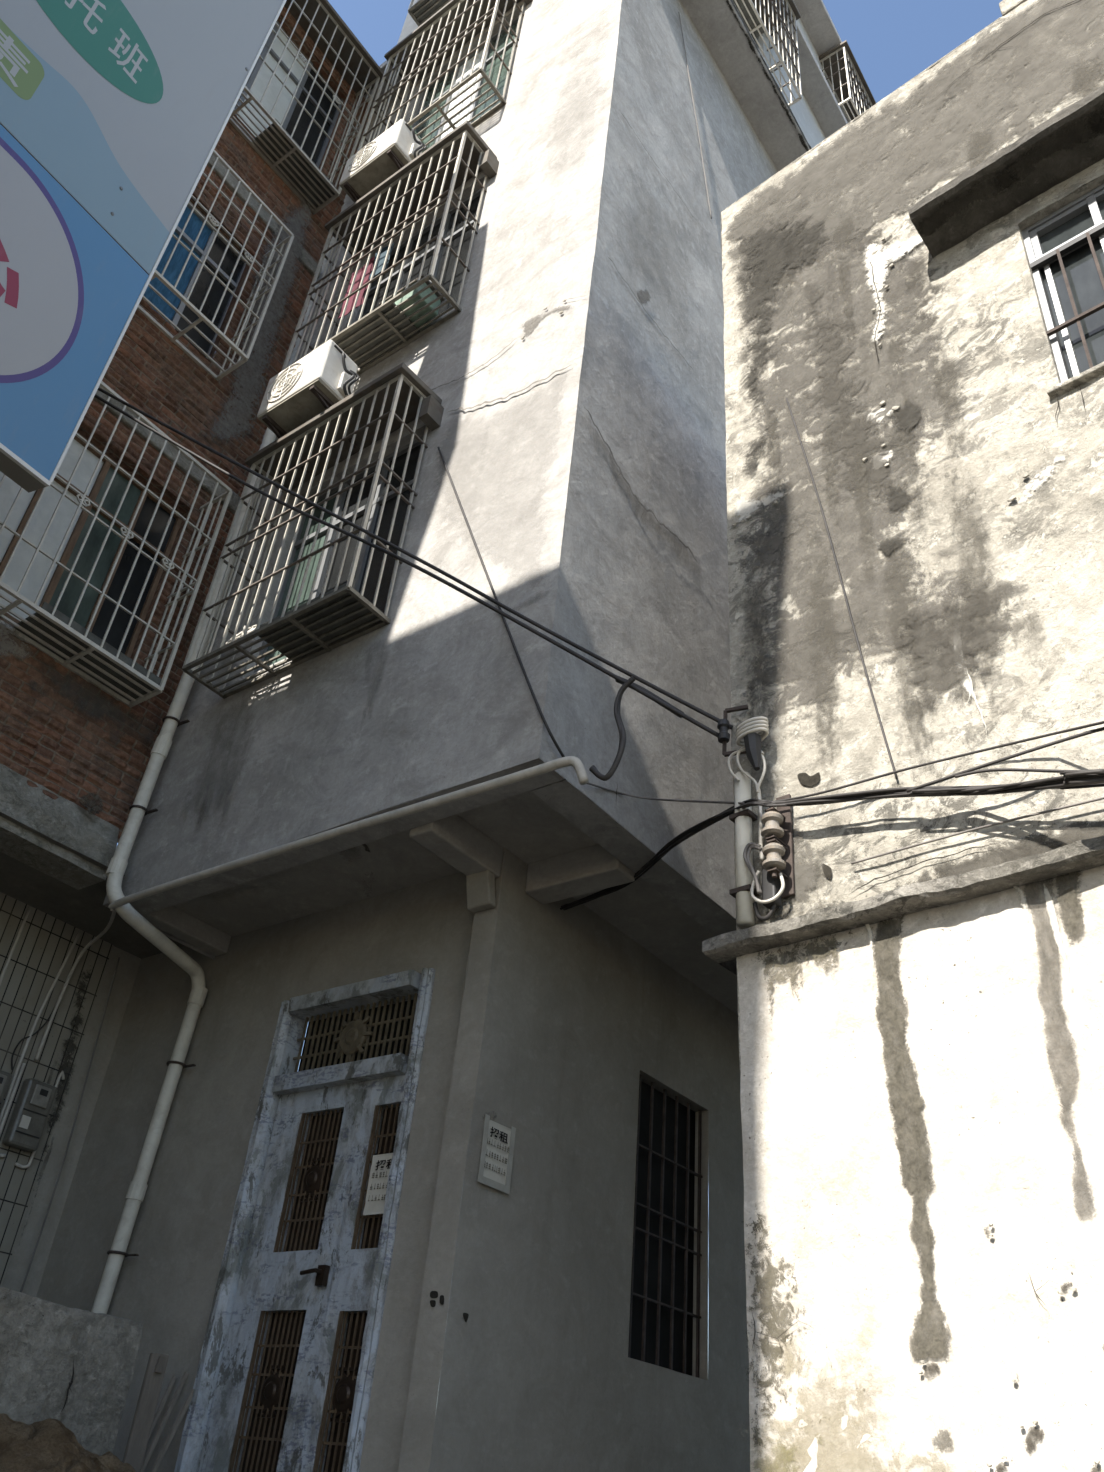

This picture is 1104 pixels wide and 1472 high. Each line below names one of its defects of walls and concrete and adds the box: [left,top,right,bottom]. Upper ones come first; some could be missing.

leakage [726,0,1104,511]
leakage [737,496,1034,757]
leakage [757,915,951,1360]
leakage [1013,870,1095,1218]
leakage [745,1213,806,1446]